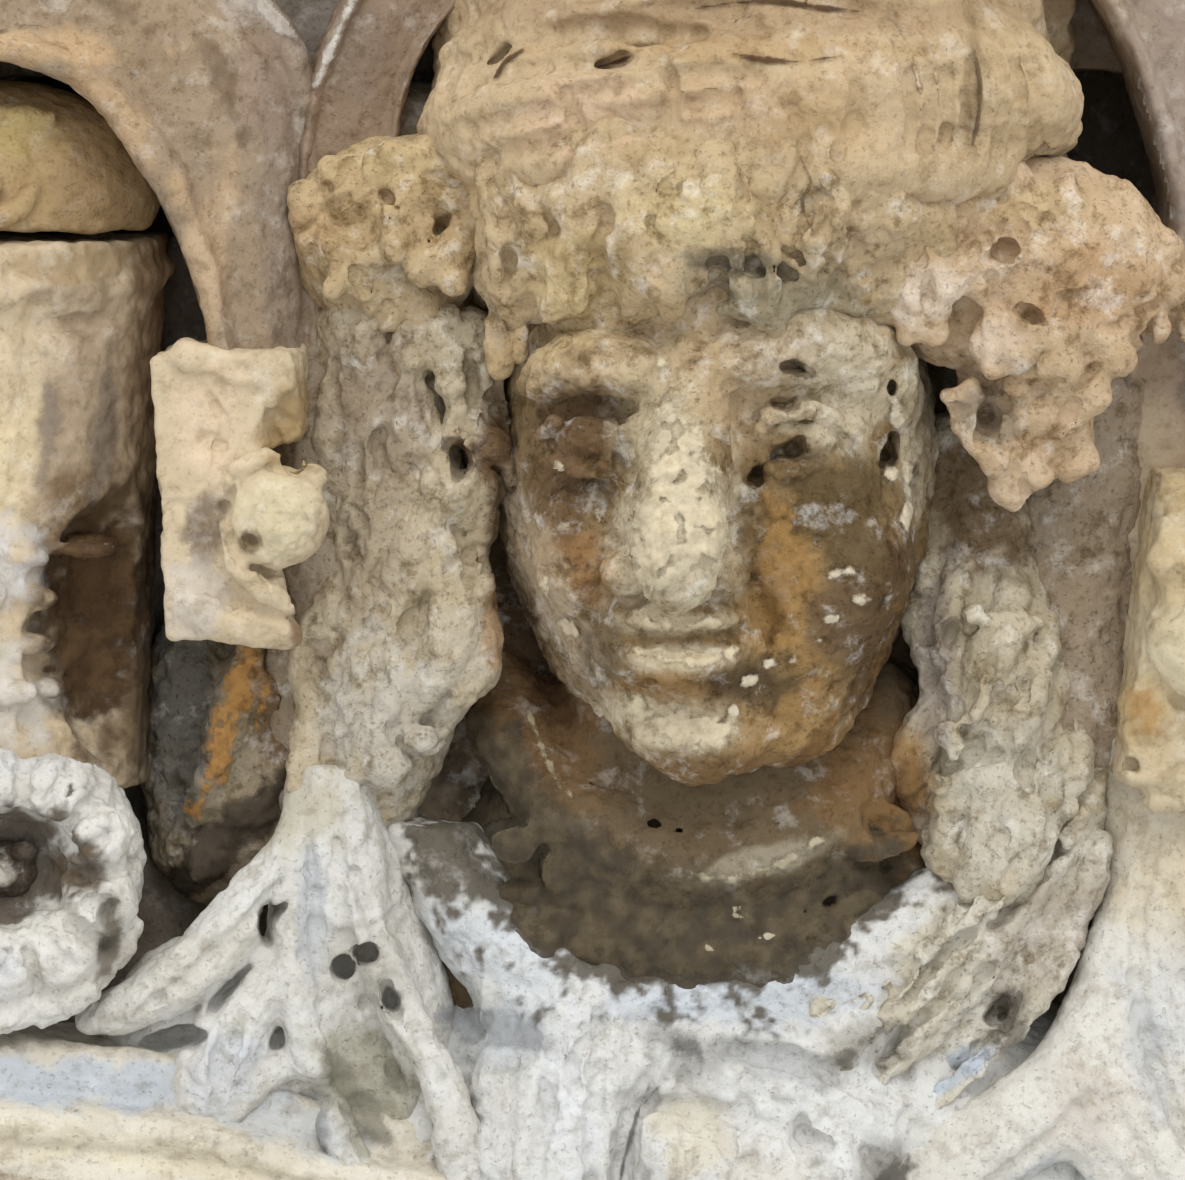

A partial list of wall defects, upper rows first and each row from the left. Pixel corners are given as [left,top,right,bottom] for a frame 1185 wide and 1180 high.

corrosion [763,494,808,644]
corrosion [183,646,271,819]
water stain [460,707,912,984]